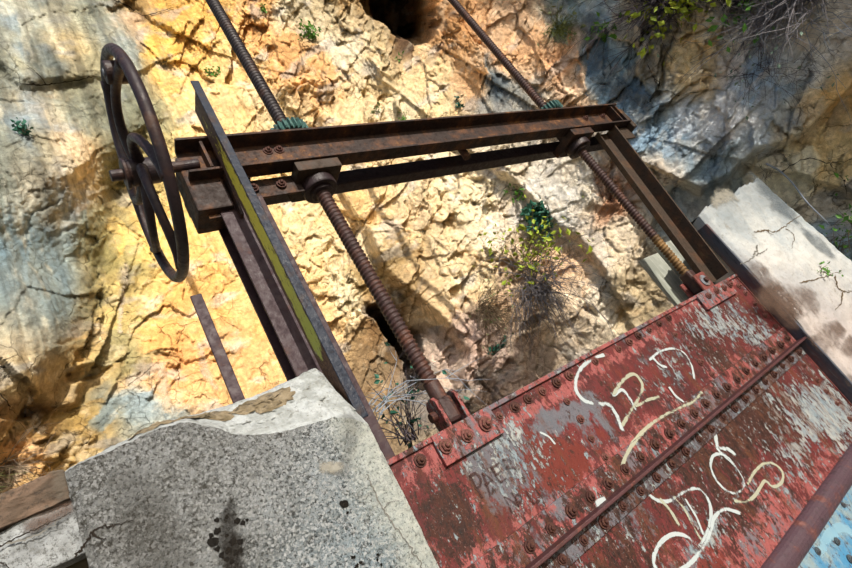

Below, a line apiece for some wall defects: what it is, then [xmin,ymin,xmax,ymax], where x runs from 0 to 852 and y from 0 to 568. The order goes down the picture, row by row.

crack [740,216,799,264]
rust [759,267,814,320]
crack [799,276,851,310]
crack [0,512,71,568]
water stain [220,499,242,568]